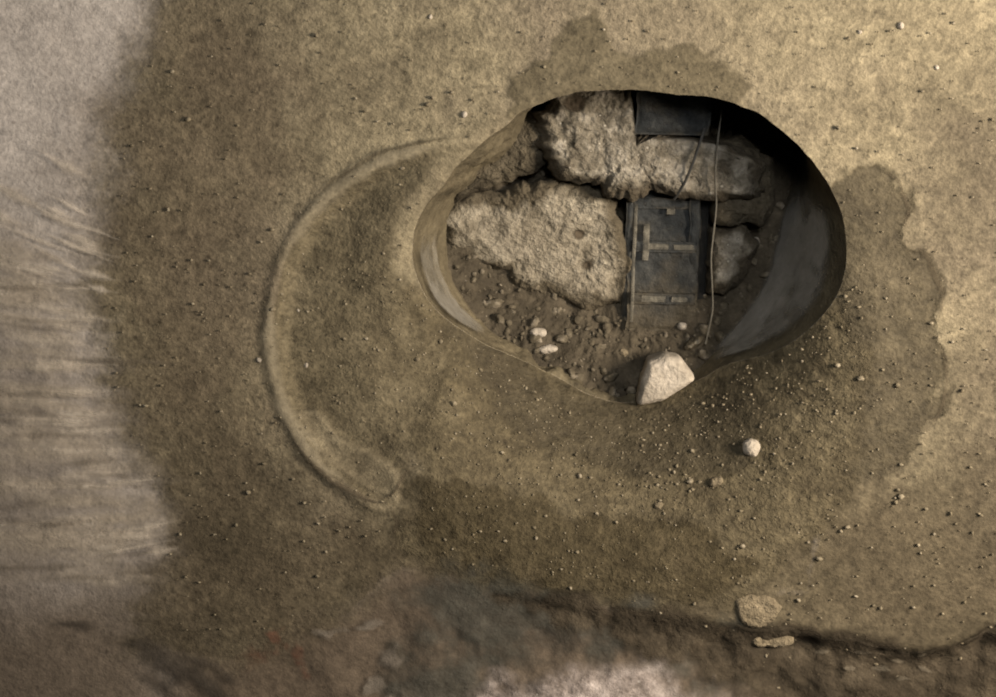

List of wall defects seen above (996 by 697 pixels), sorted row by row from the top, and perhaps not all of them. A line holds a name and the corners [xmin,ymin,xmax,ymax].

leakage [508,12,749,118]
leakage [964,161,996,208]
hole [412,107,636,403]
leakage [979,223,996,250]
leakage [973,351,996,397]
efflorescence [0,388,156,552]
leakage [975,420,996,476]
leakage [952,501,996,550]
leakage [202,503,296,619]
leakage [586,592,747,630]
leakage [752,510,996,656]
leakage [386,657,671,697]